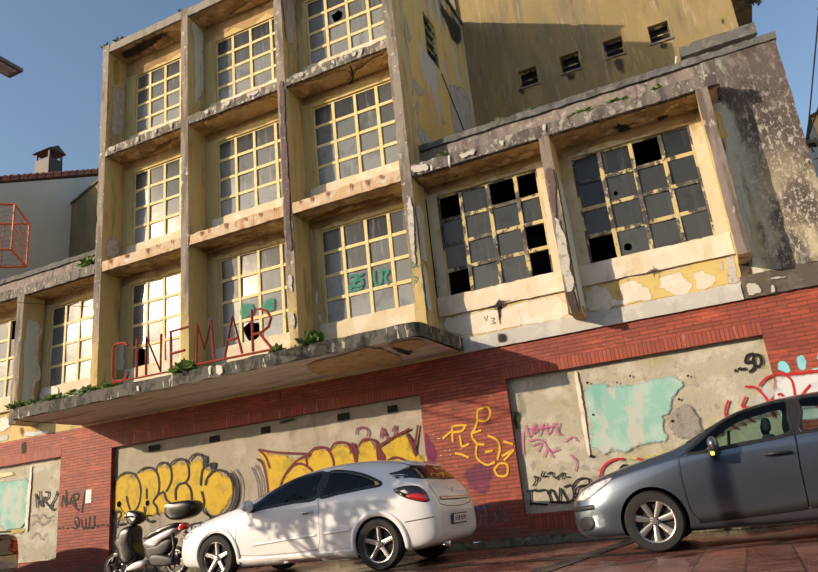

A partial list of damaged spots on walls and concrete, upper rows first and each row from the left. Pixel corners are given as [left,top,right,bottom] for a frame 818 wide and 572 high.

peeling [192,22,208,114]
peeling [443,85,472,133]
peeling [444,167,761,335]
peeling [21,319,58,406]
peeling [0,417,10,442]
peeling [574,371,702,458]
peeling [0,466,32,532]